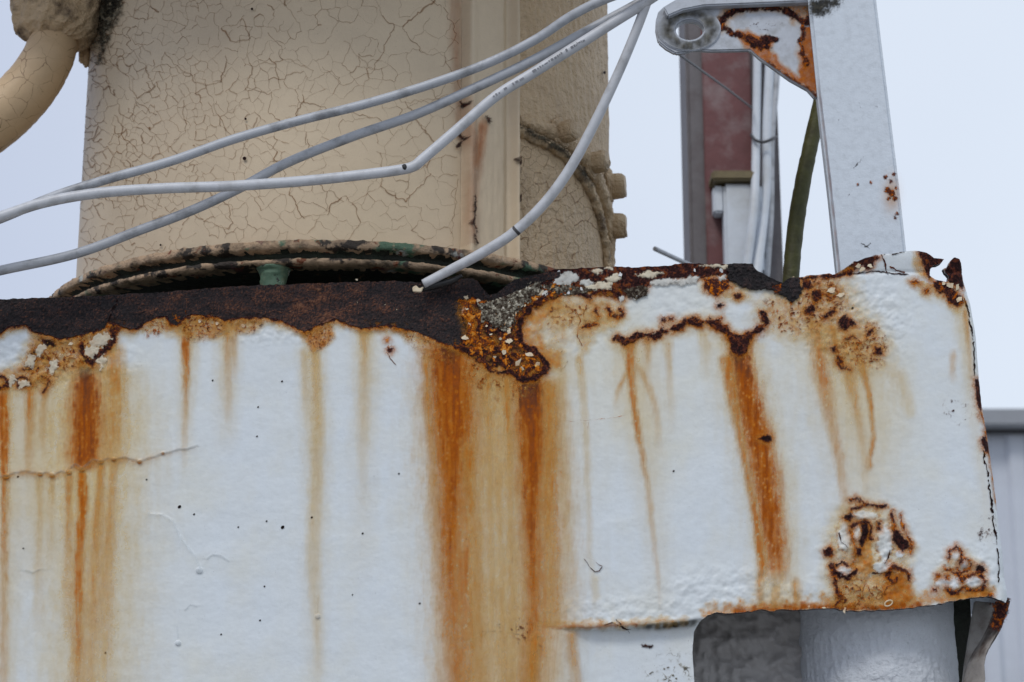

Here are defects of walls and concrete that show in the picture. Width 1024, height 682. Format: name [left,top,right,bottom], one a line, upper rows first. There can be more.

rust [719,6,817,97]
crack [85,0,459,264]
crack [520,149,598,266]
rust [181,321,190,387]
rust [301,324,334,358]
peeling [0,263,729,394]
rust [703,276,746,309]
rust [764,268,886,467]
rust [909,257,968,329]
rust [49,348,130,663]
rust [361,279,587,682]
rust [703,335,1010,631]